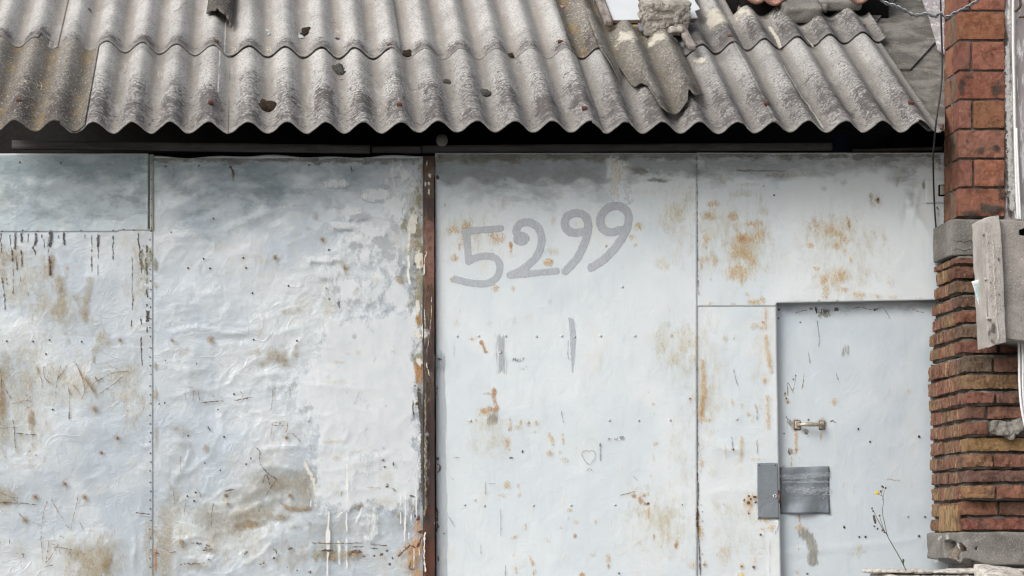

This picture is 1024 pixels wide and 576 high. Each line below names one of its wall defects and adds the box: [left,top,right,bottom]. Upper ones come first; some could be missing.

corrosion [1,250,23,310]
corrosion [730,222,764,283]
corrosion [469,388,536,458]